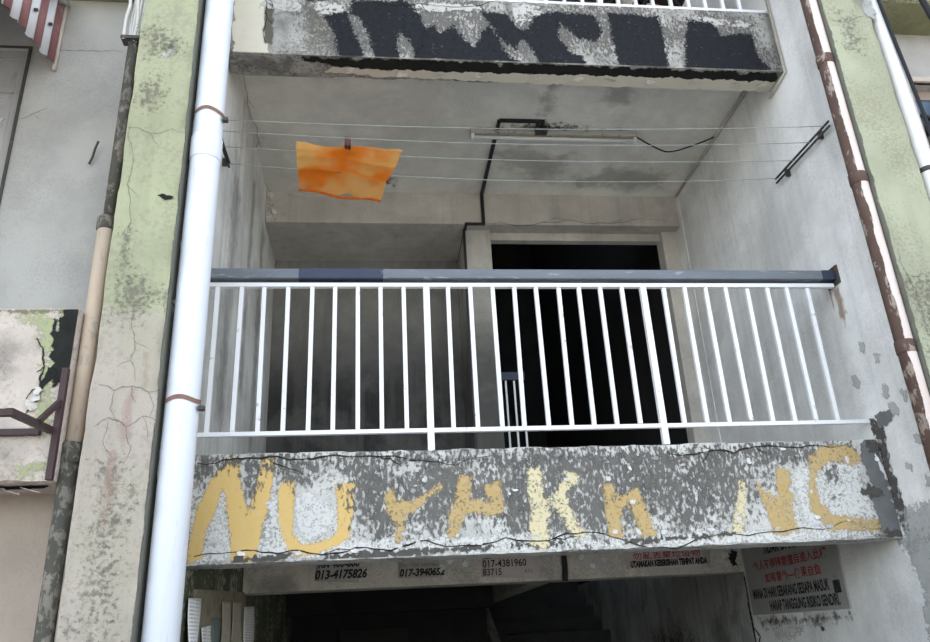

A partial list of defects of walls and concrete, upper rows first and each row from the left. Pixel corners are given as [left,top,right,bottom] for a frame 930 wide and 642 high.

peeling [259,0,302,12]
peeling [313,1,344,15]
peeling [414,1,482,12]
peeling [512,3,541,26]
peeling [693,16,751,29]
leakage [78,0,206,642]
peeling [375,459,427,493]
spalling [860,384,930,554]
spalling [0,485,49,495]
spalling [232,550,301,563]
spalling [323,528,564,576]
spalling [596,524,737,566]